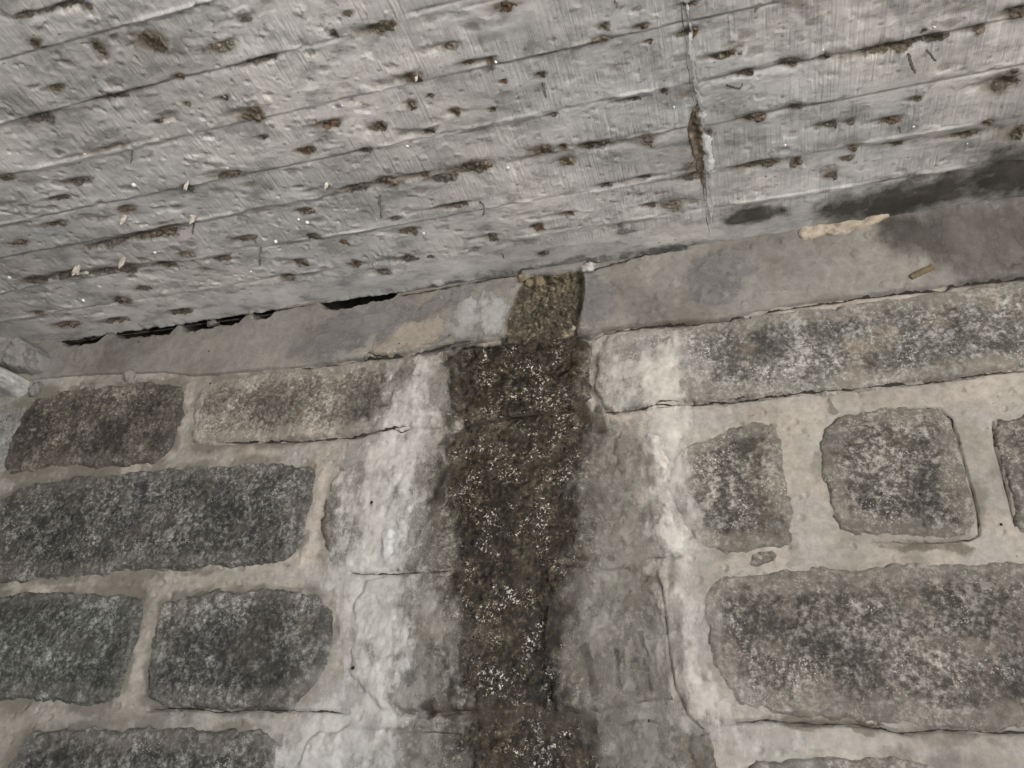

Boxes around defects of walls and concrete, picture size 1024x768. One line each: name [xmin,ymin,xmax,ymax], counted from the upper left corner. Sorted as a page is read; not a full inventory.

leakage [819,148,1024,278]
crack [54,304,312,343]
leakage [274,244,770,768]